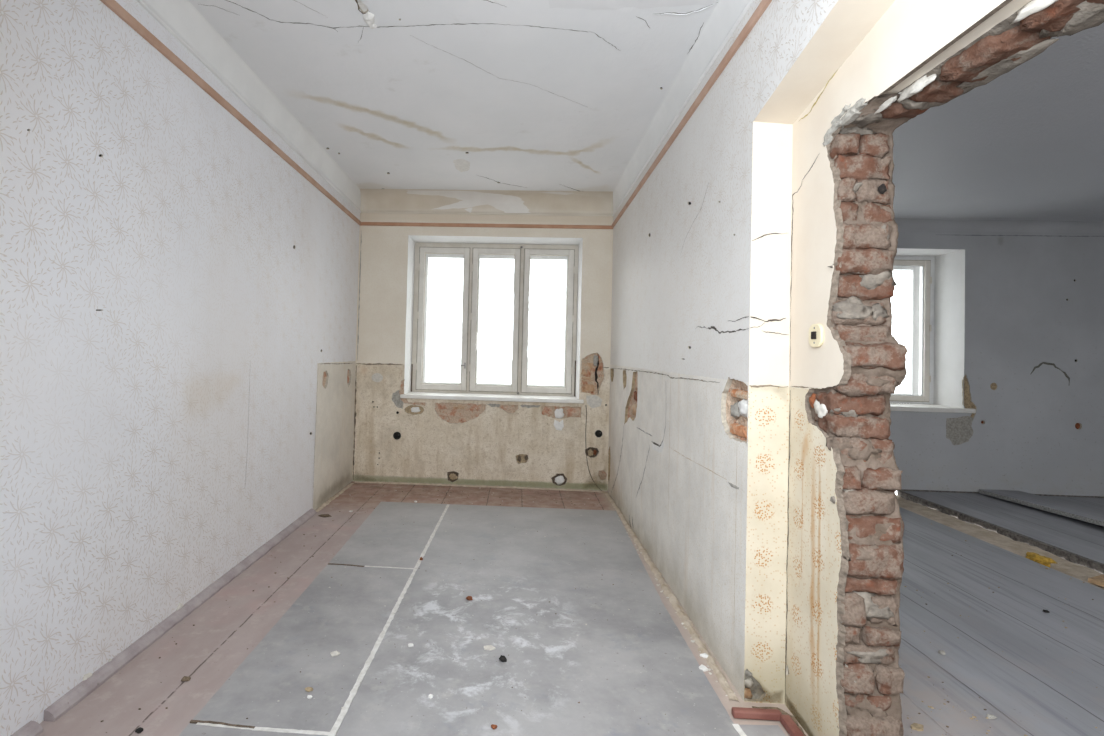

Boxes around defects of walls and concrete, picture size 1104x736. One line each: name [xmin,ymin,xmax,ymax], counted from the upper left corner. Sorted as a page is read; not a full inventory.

crack [200,0,620,103]
crack [638,2,718,54]
flaking render [880,0,1104,119]
crack [695,153,820,354]
flaking render [399,379,582,424]
flaking render [581,353,638,424]
crack [612,426,666,493]
flaking render [721,377,748,444]
flaking render [809,133,907,736]
flaking render [962,375,985,424]
crack [1025,356,1076,386]